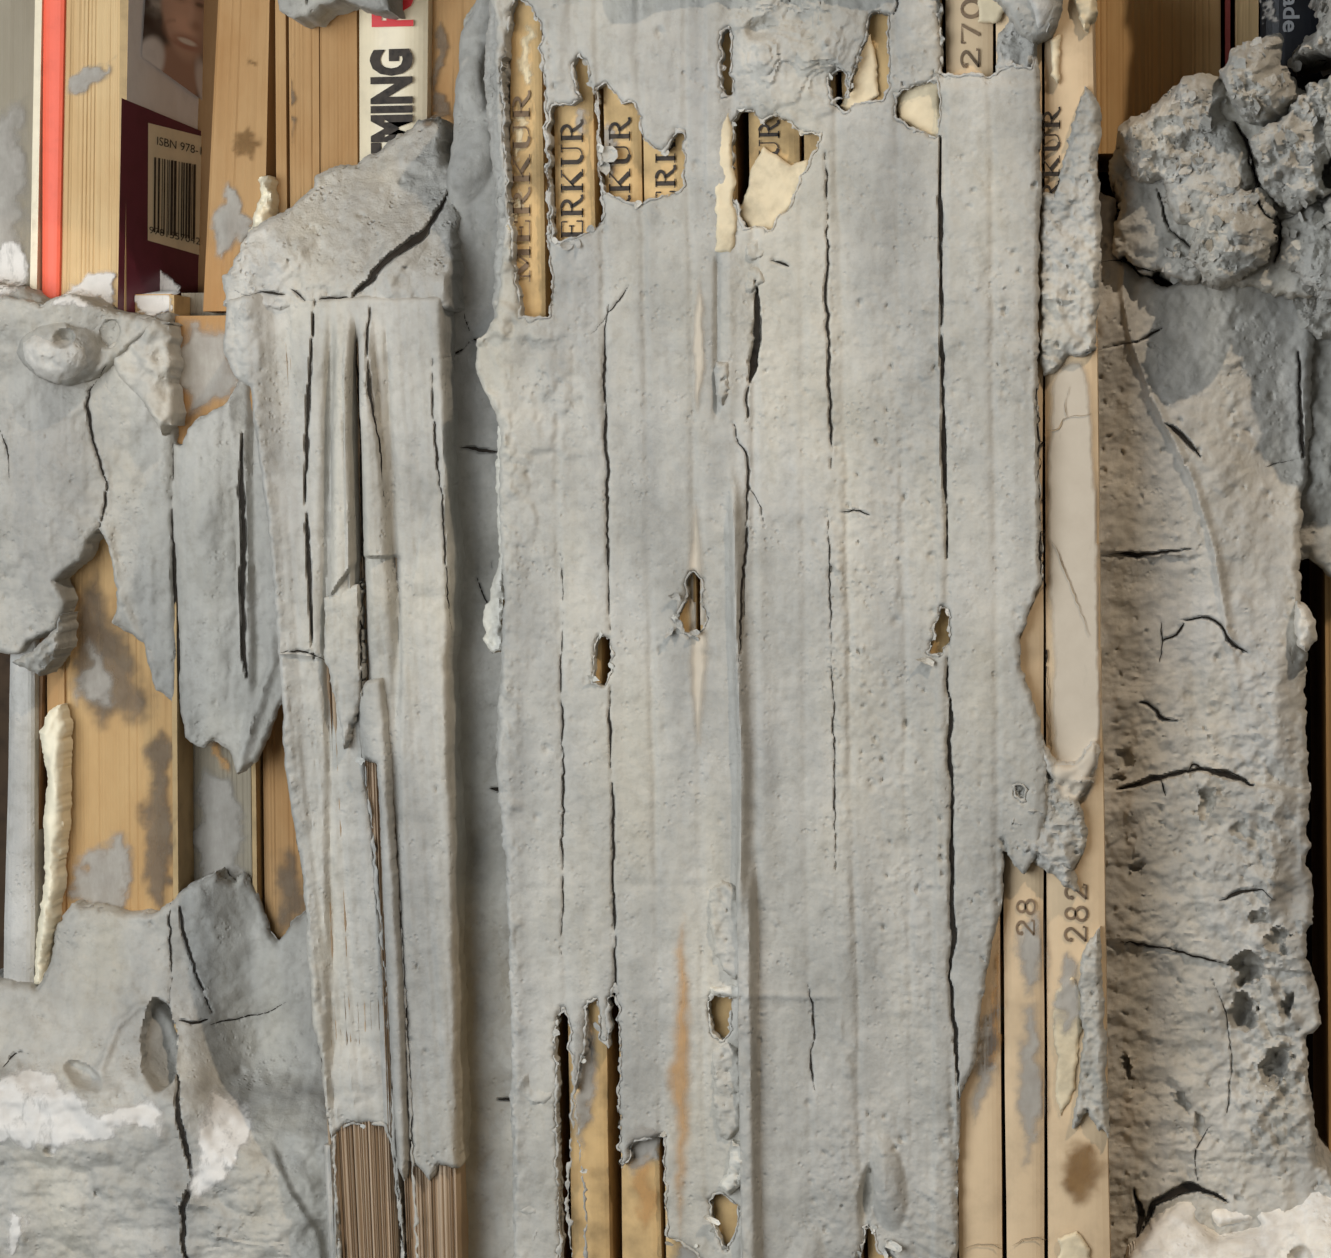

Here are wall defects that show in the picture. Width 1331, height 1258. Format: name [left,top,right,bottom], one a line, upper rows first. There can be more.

crack [235,193,448,681]
spalling [499,0,687,323]
crack [732,260,789,660]
crack [824,157,833,459]
spalling [826,0,1035,138]
crack [939,137,948,557]
spalling [587,632,615,687]
spalling [331,757,420,1258]
spalling [552,983,700,1258]
spalling [704,1192,740,1253]
crack [946,667,959,1082]
crack [1121,941,1232,1237]